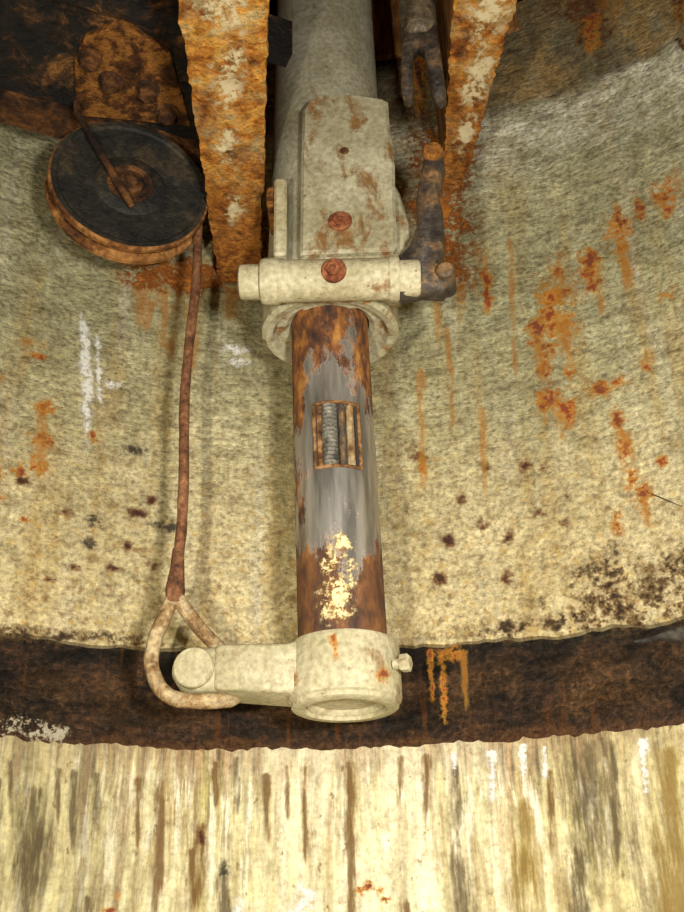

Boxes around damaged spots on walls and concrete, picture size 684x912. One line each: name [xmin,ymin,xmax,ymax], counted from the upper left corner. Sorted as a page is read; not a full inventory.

corrosion [604,180,676,263]
corrosion [577,248,602,292]
corrosion [525,258,580,430]
corrosion [0,431,54,485]
corrosion [611,407,653,515]
corrosion [427,645,462,723]
water stain [153,779,165,912]
water stain [188,823,205,910]
water stain [216,861,245,912]
water stain [263,773,271,841]
water stain [345,761,356,912]
water stain [572,740,620,912]